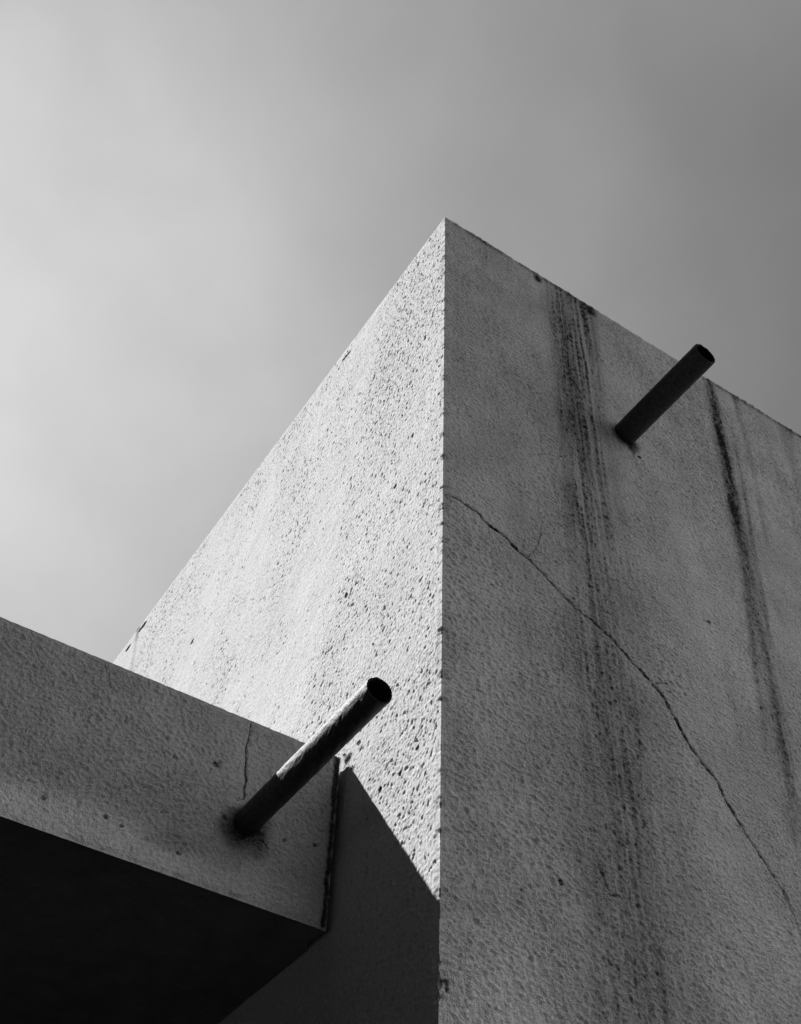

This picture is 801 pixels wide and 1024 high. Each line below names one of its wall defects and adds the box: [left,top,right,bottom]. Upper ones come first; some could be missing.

damp [552,286,613,606]
damp [707,378,770,666]
crack [242,721,252,800]
damp [577,621,650,914]
crack [442,493,793,915]
damp [603,933,670,1024]